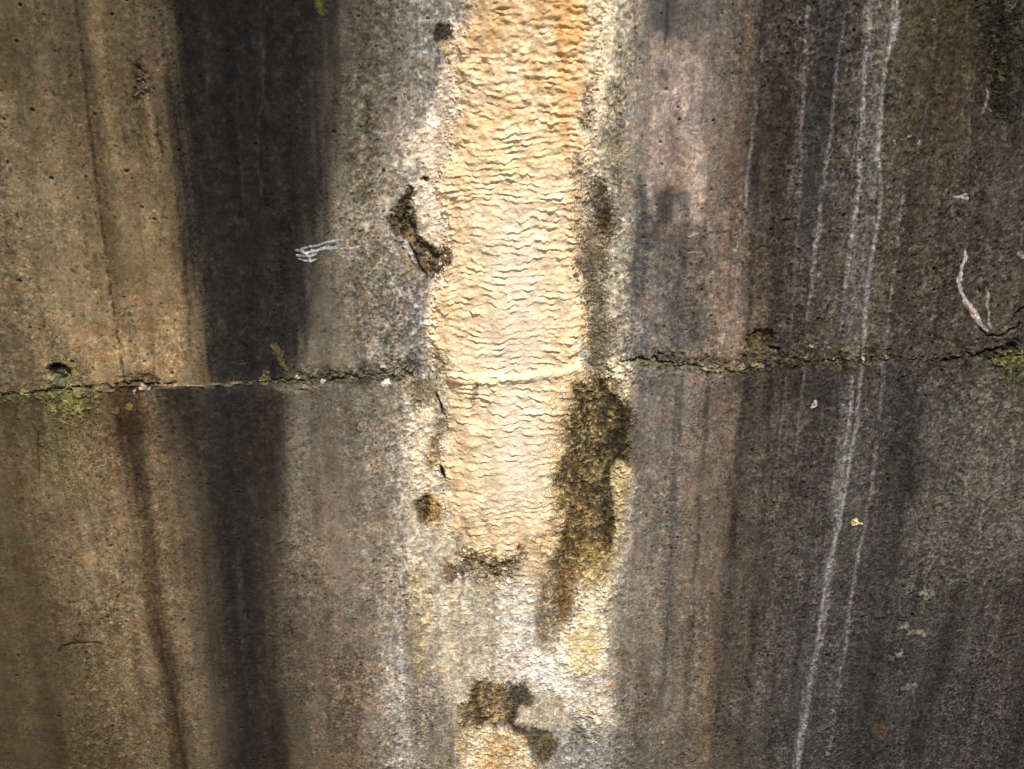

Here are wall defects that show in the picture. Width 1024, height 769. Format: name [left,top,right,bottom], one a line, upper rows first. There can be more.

spalling [384,175,457,285]
crack [164,379,274,390]
leakage [135,0,355,769]
leakage [382,0,709,769]
leakage [654,0,1024,769]
crack [893,306,1024,365]
spalling [411,489,445,528]